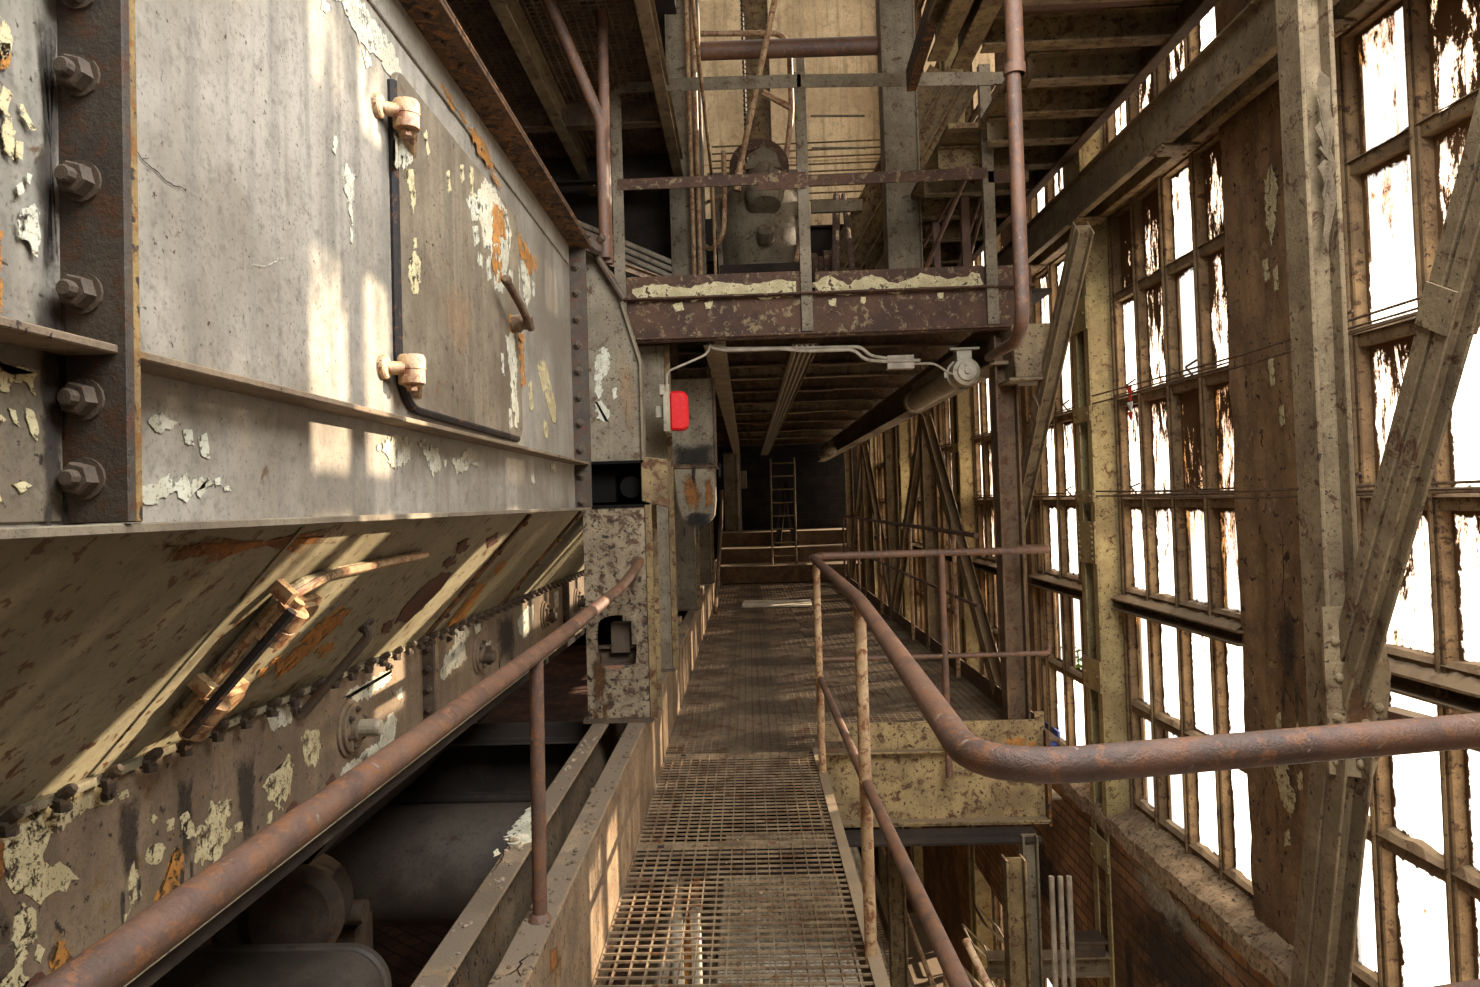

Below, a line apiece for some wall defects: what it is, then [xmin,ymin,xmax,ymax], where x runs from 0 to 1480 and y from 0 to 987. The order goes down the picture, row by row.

peeling [0,81,41,258]
rust [441,83,538,283]
peeling [632,272,983,312]
rust [509,313,526,387]
peeling [0,363,39,441]
peeling [0,482,32,502]
rust [167,530,322,564]
rust [446,560,507,627]
rust [258,604,351,680]
rust [1346,684,1374,723]
peeling [0,786,129,987]
peeling [124,798,243,923]